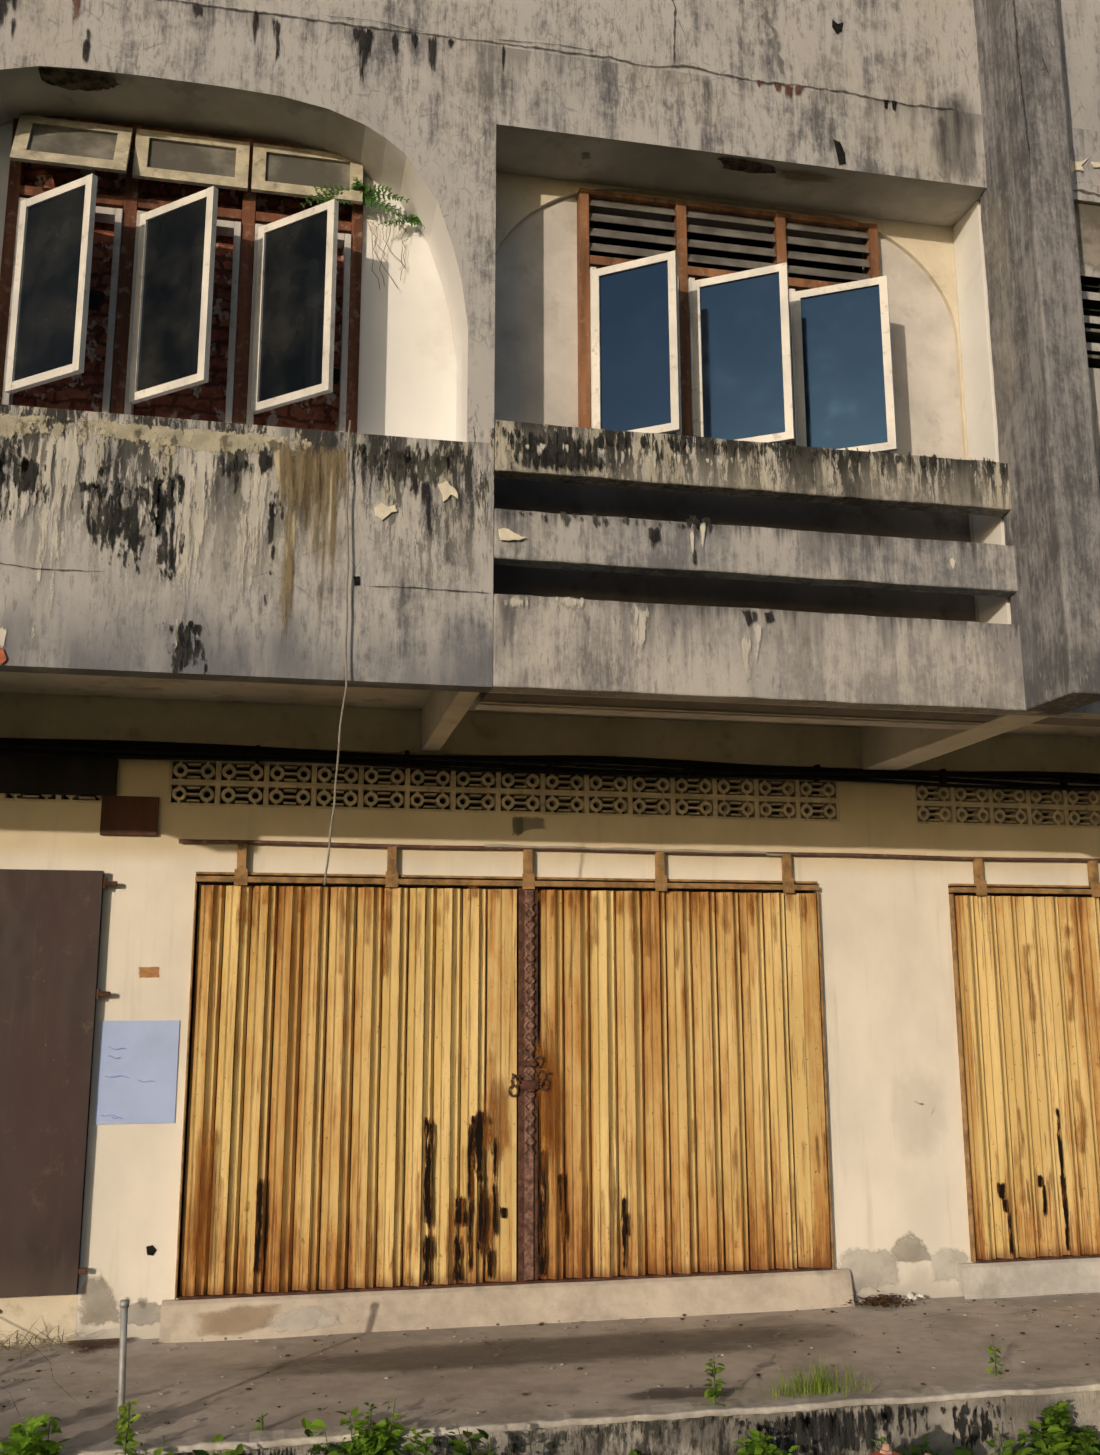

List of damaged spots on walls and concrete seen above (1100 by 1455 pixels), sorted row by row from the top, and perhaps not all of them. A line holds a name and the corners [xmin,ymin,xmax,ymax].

leakage [353,27,374,78]
leakage [392,32,454,70]
crack [168,0,953,110]
flaking render [1069,158,1100,269]
leakage [496,427,1005,476]
leakage [0,423,465,626]
peeling [374,503,398,521]
peeling [439,480,459,502]
peeling [498,528,526,541]
leakage [163,619,207,674]
spalling [79,1277,161,1326]
leakage [386,1399,1004,1455]